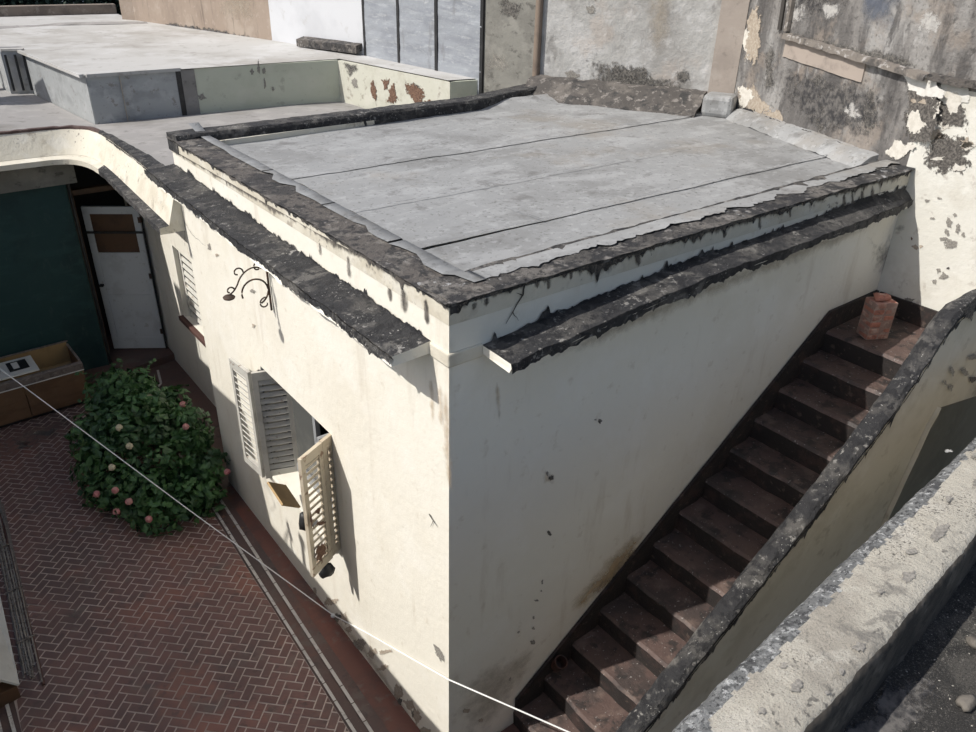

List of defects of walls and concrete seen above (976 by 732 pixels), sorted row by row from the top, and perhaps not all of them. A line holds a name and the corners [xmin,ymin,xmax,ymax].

peeling [742,6,761,66]
leakage [764,47,774,89]
leakage [786,0,838,21]
leakage [821,41,915,67]
leakage [918,12,940,33]
peeling [370,78,431,104]
peeling [735,83,783,121]
leakage [786,70,884,136]
peeling [885,75,976,175]
peeling [930,213,965,248]
leakage [581,542,636,604]
peeling [313,588,392,671]